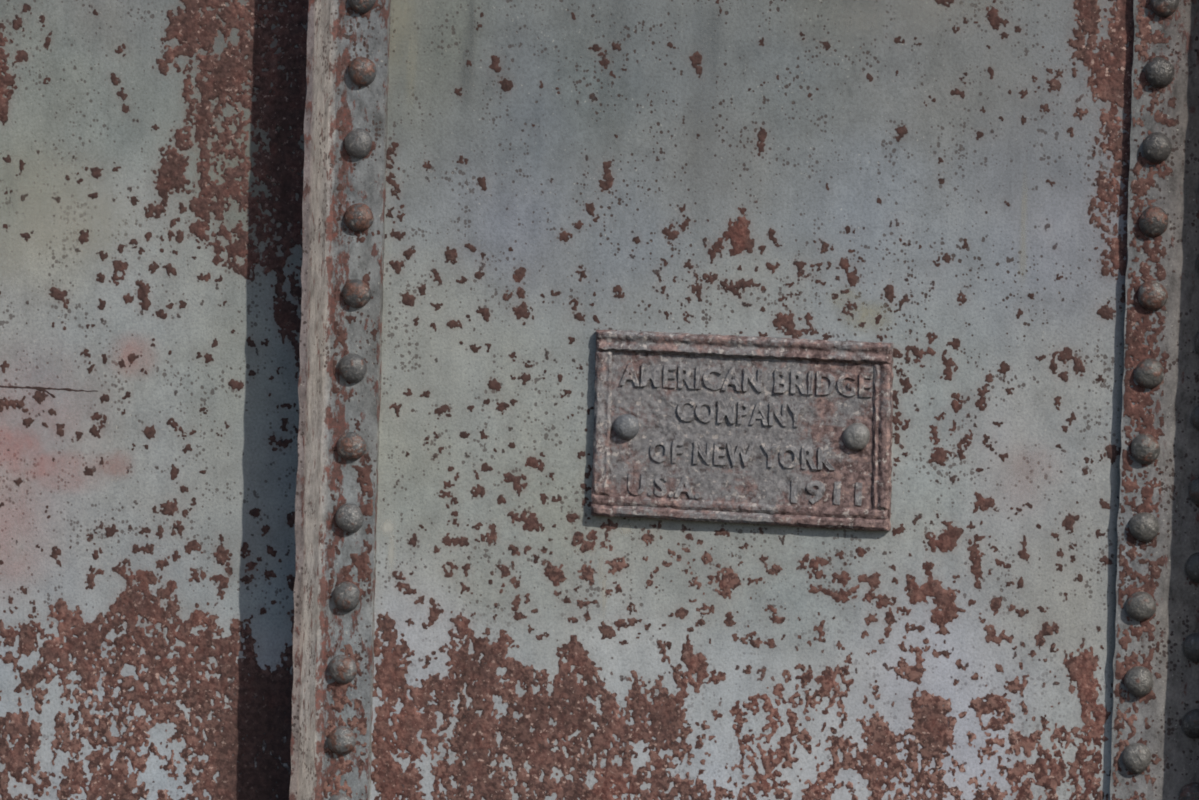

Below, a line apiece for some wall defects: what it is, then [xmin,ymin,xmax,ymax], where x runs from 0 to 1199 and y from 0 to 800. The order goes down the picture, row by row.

rust [0,3,52,126]
rust [2,155,26,176]
rust [65,0,308,465]
rust [48,287,69,330]
rust [0,391,131,441]
rust [83,457,104,476]
rust [324,0,1199,800]
rust [0,464,295,800]